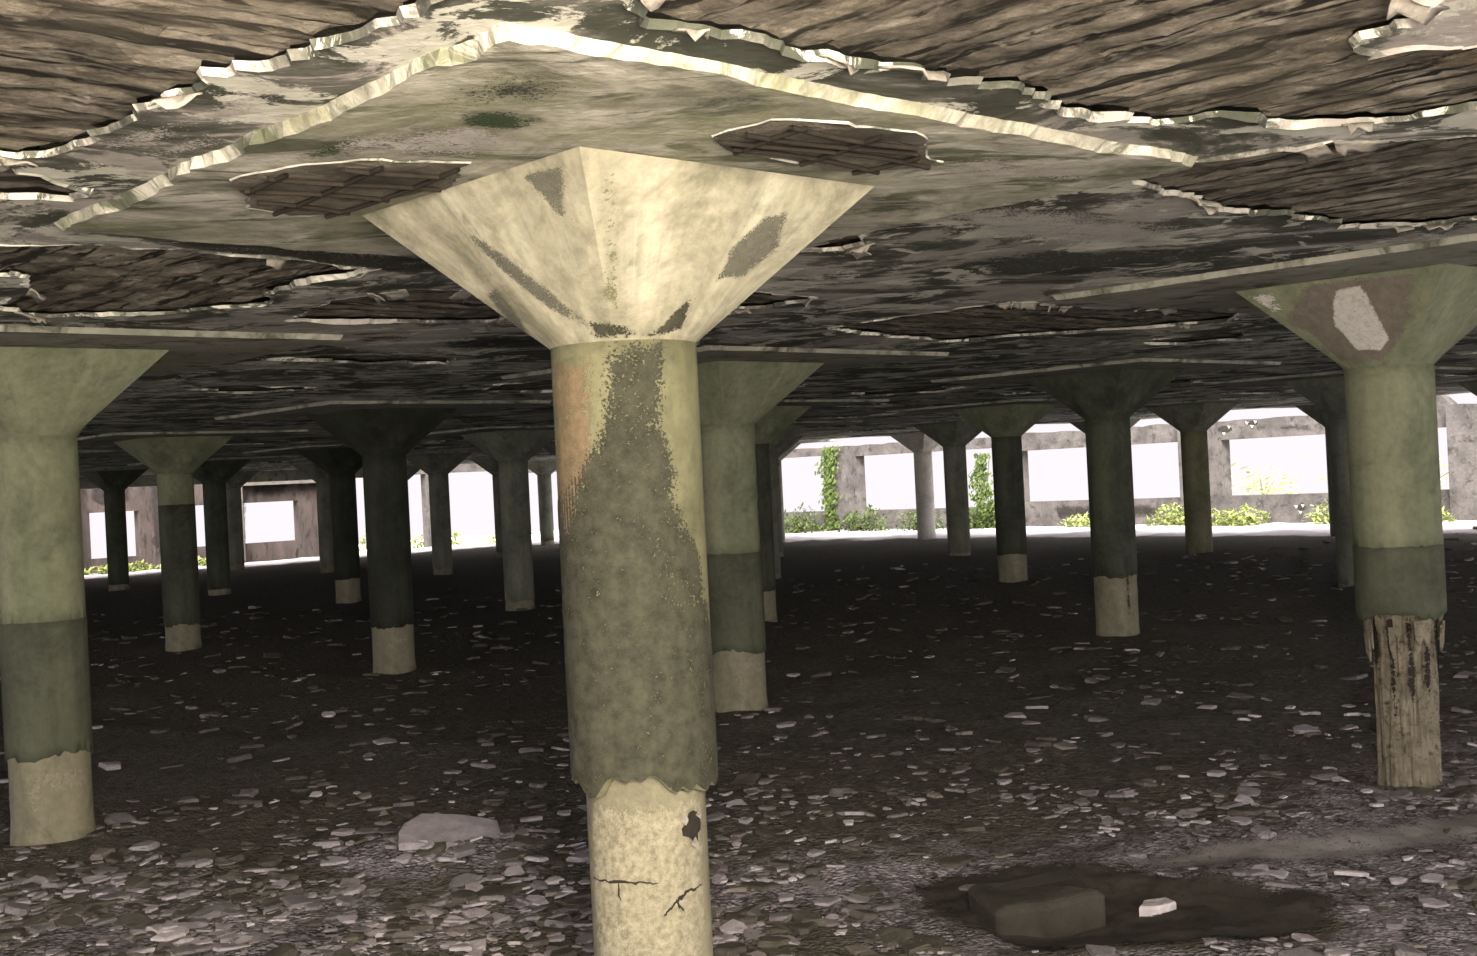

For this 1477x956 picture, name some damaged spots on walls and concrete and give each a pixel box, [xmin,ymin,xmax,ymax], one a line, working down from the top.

spalling [0,0,443,202]
spalling [623,0,1477,233]
spalling [229,158,471,219]
spalling [799,234,876,261]
spalling [0,244,508,327]
spalling [728,290,819,316]
spalling [825,293,1283,345]
peeling [1333,284,1390,352]
spalling [261,353,475,365]
spalling [481,380,553,393]
peeling [592,790,706,956]